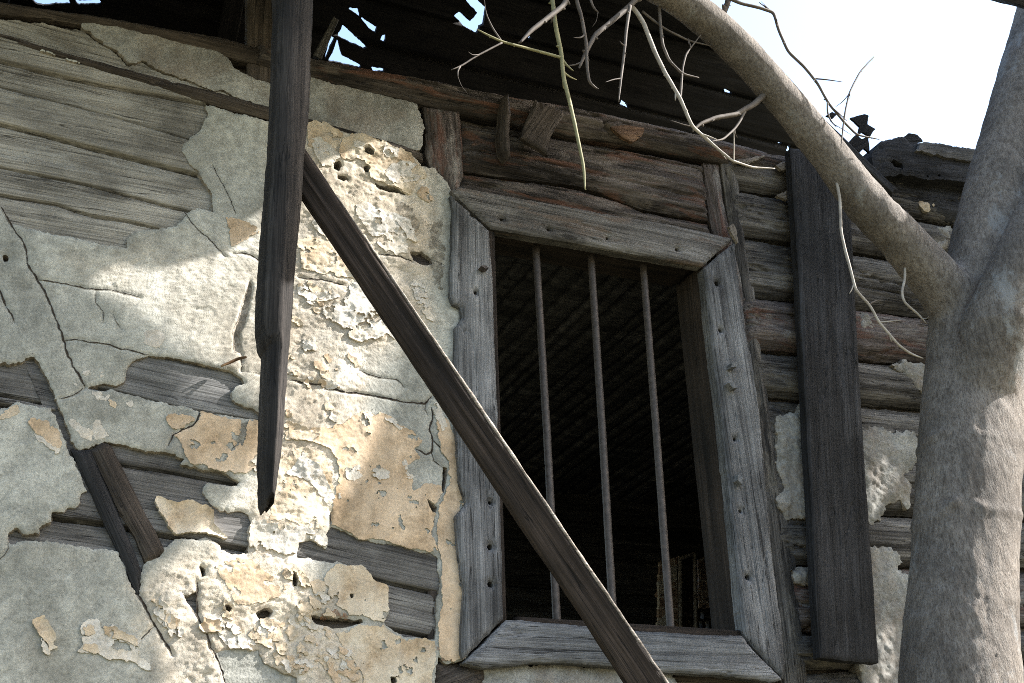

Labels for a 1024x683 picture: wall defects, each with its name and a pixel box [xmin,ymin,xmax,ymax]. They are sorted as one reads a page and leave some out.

spalling [0,19,229,248]
peeling [307,120,434,203]
crack [1,207,149,399]
crack [183,210,258,260]
peeling [226,217,260,246]
peeling [293,219,395,343]
peeling [356,202,432,265]
peeling [0,339,465,683]